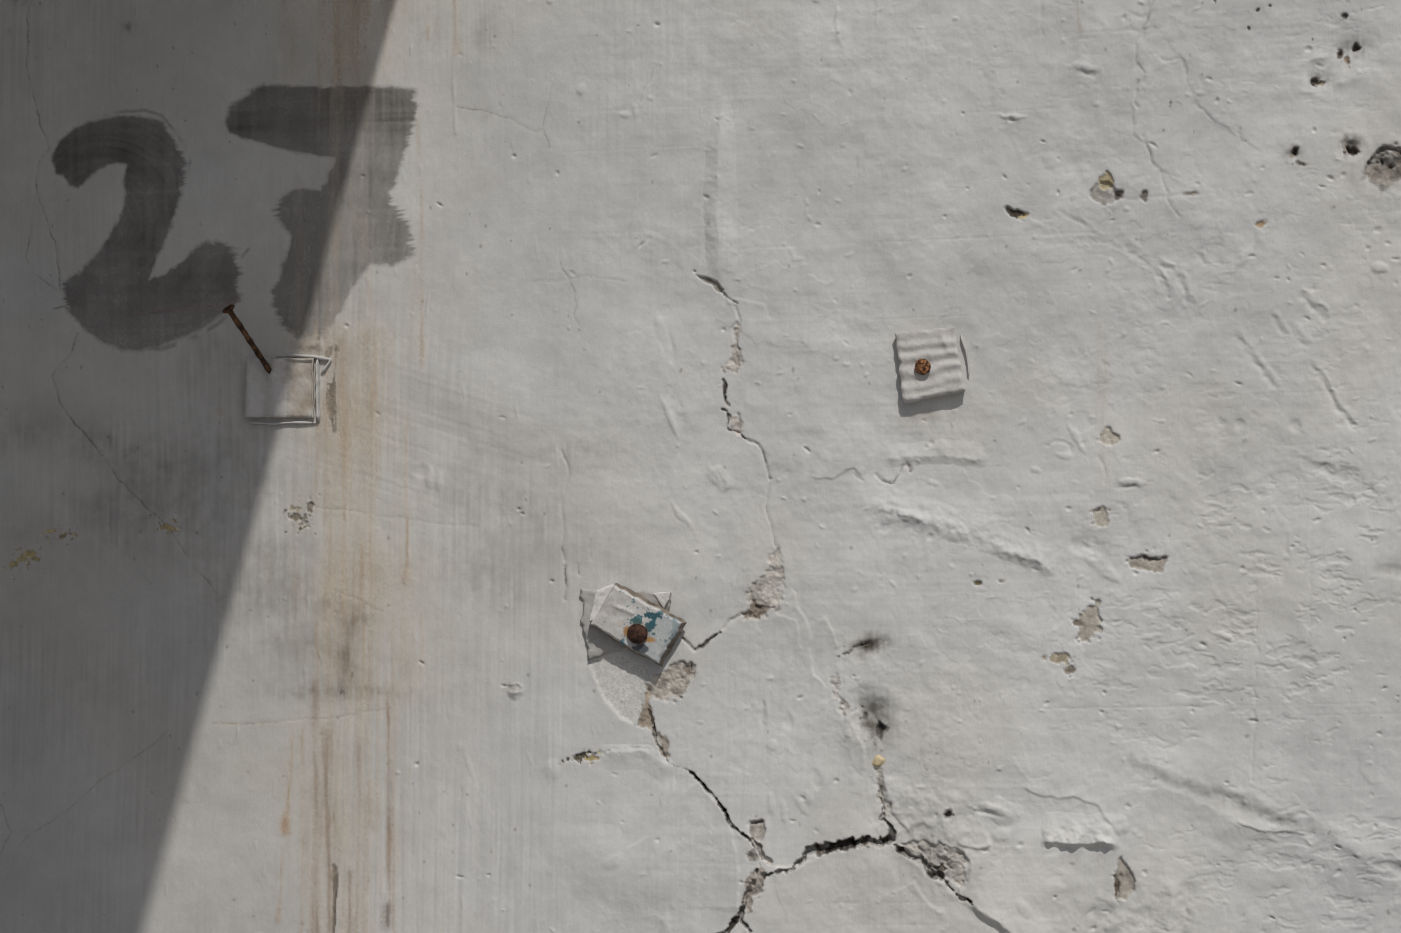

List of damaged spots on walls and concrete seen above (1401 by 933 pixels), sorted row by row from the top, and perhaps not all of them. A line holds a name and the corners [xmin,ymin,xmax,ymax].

peeling [1090,170,1148,206]
spalling [1341,136,1401,189]
crack [721,379,767,463]
peeling [282,494,320,533]
spalling [742,548,785,620]
crack [681,615,739,650]
peeling [1041,598,1102,678]
peeling [562,655,696,785]
crack [651,715,973,933]
peeling [1113,858,1135,900]